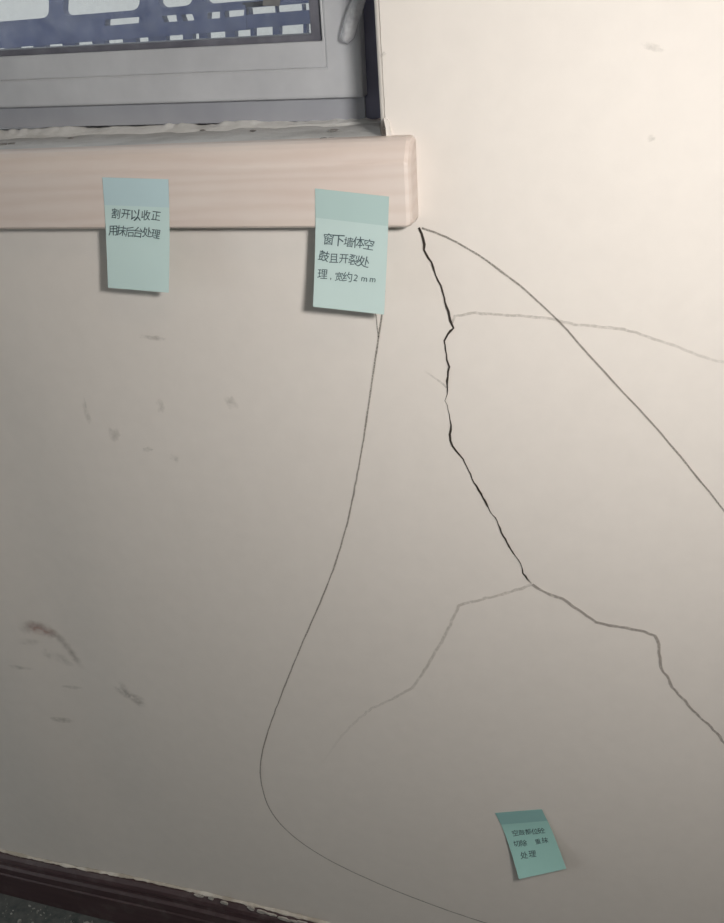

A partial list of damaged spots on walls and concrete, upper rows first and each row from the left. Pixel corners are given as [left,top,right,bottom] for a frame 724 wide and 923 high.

crack [418,227,724,744]